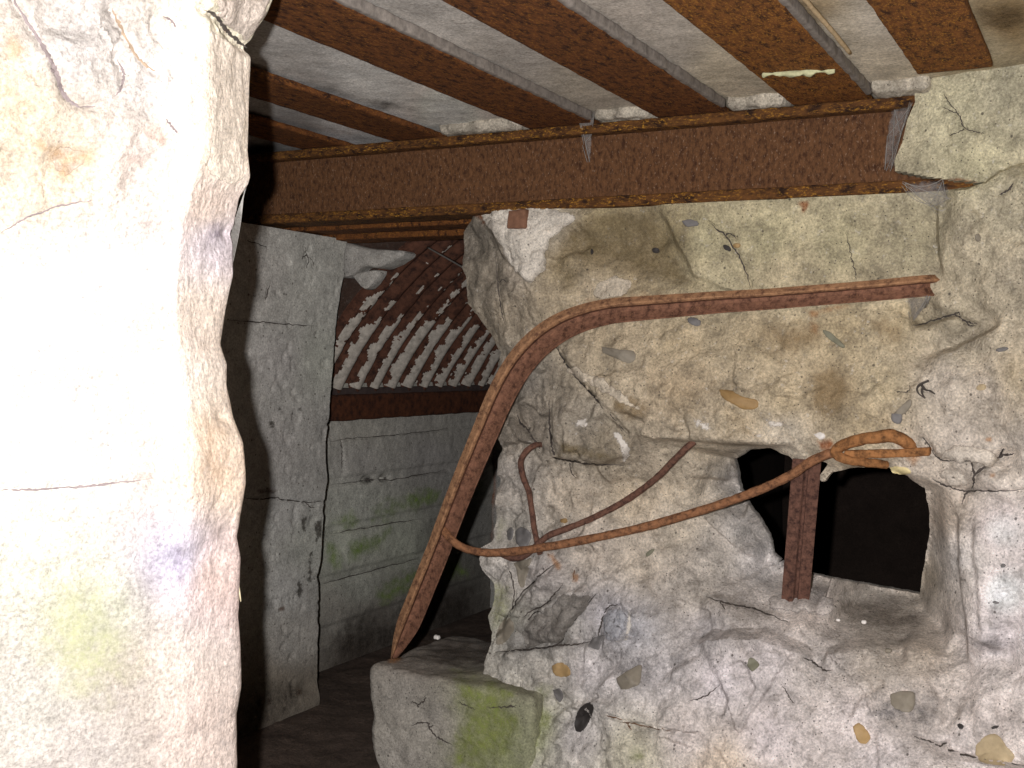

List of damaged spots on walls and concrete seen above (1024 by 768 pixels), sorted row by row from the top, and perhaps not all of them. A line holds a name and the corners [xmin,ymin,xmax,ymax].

crack [940,95,985,136]
crack [1,200,92,233]
crack [713,225,752,289]
peeling [331,270,501,390]
crack [915,311,977,327]
crack [3,478,152,491]
crack [922,437,1023,504]
crack [505,561,575,620]
crack [495,594,618,653]
crack [411,694,451,744]